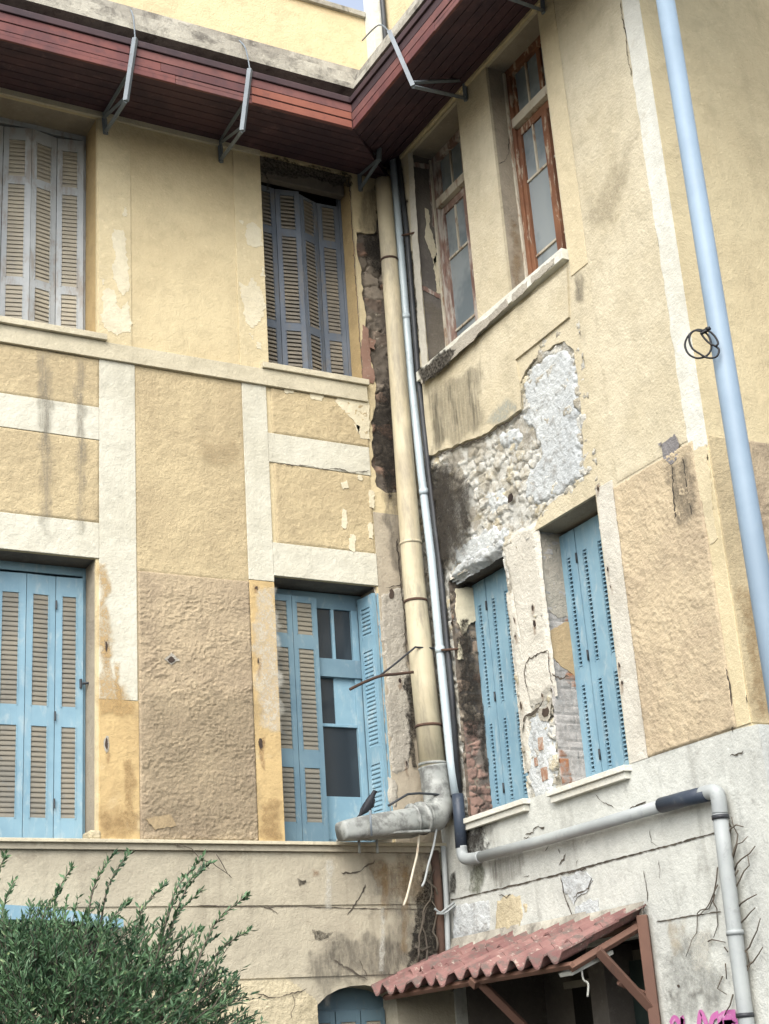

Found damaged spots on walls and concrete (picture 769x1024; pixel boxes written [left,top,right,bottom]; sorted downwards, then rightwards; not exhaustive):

peeling [239,220,263,248]
peeling [100,229,133,336]
peeling [239,266,266,350]
flaking render [310,185,397,509]
peeling [341,509,356,552]
flaking render [417,323,600,827]
crack [199,861,420,915]
crack [451,826,721,922]